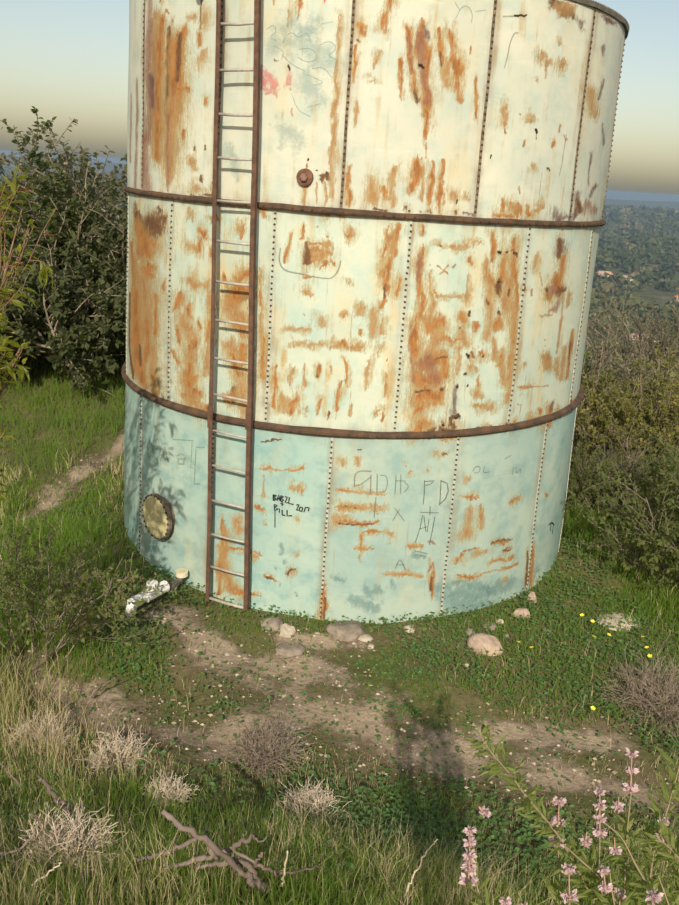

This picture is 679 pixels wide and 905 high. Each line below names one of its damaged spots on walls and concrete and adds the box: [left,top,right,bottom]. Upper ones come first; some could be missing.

rust [129,0,207,191]
rust [328,16,353,206]
rust [352,22,367,79]
rust [381,0,394,33]
rust [366,18,473,216]
rust [128,201,167,396]
rust [186,207,218,257]
rust [171,223,402,419]
rust [408,155,598,441]
rust [216,517,262,599]
rust [331,488,393,562]
rust [454,494,535,586]